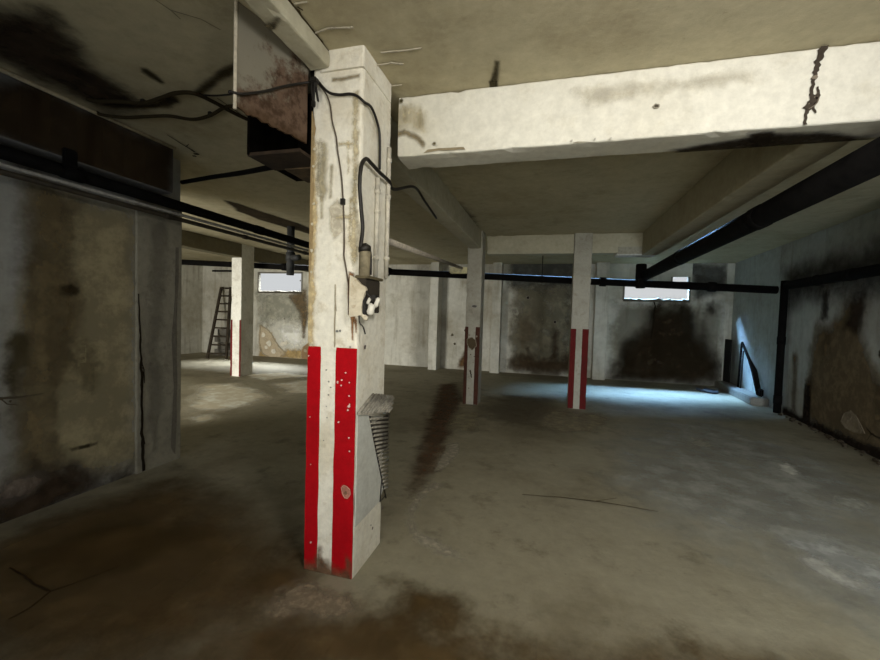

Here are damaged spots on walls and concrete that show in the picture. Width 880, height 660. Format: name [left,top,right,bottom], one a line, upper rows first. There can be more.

leakage [0,9,133,111]
crack [803,45,829,125]
leakage [0,175,135,524]
crack [137,294,145,472]
spalling [259,325,287,357]
leakage [510,295,570,376]
leakage [612,305,721,384]
leakage [782,293,880,460]
leakage [243,555,495,660]